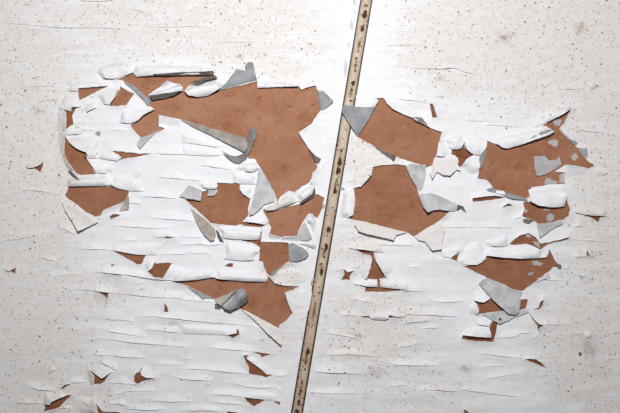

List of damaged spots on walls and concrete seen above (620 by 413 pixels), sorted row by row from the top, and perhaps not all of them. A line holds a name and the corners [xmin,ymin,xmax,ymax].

peeling [25,161,44,172]
peeling [57,61,333,345]
peeling [337,97,608,342]
peeling [87,365,115,385]
peeling [134,366,155,384]
peeling [243,351,273,377]
peeling [42,384,120,413]
peeling [244,391,281,406]